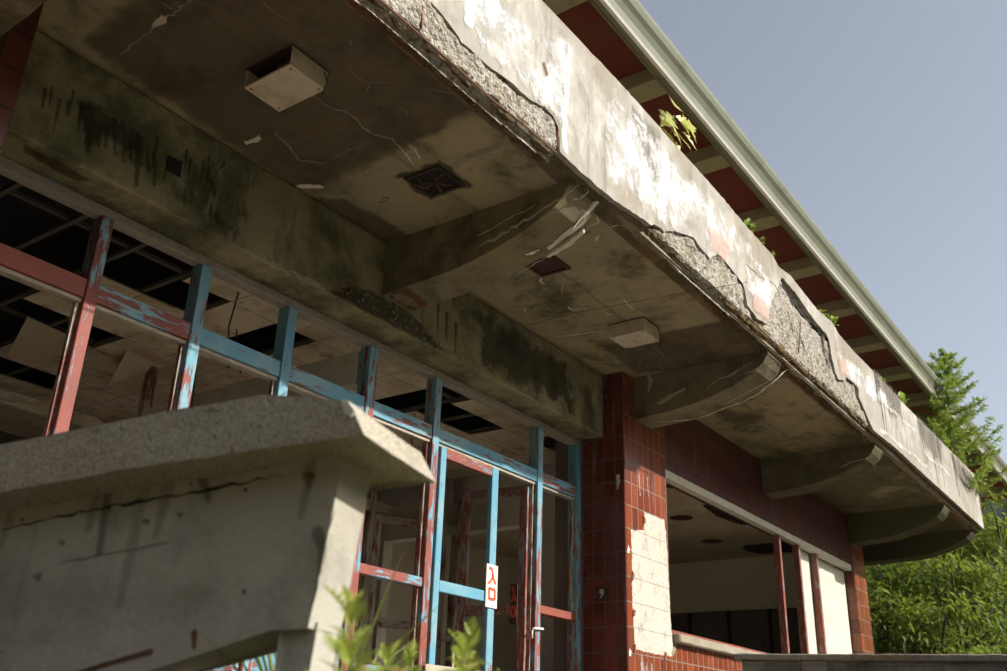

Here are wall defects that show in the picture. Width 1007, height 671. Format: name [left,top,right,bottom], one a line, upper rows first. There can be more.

water stain [24,145,85,181]
crack [110,0,191,63]
water stain [88,0,469,262]
rust [346,0,547,162]
spalling [333,0,981,531]
rust [690,279,867,438]
peeling [627,511,677,660]